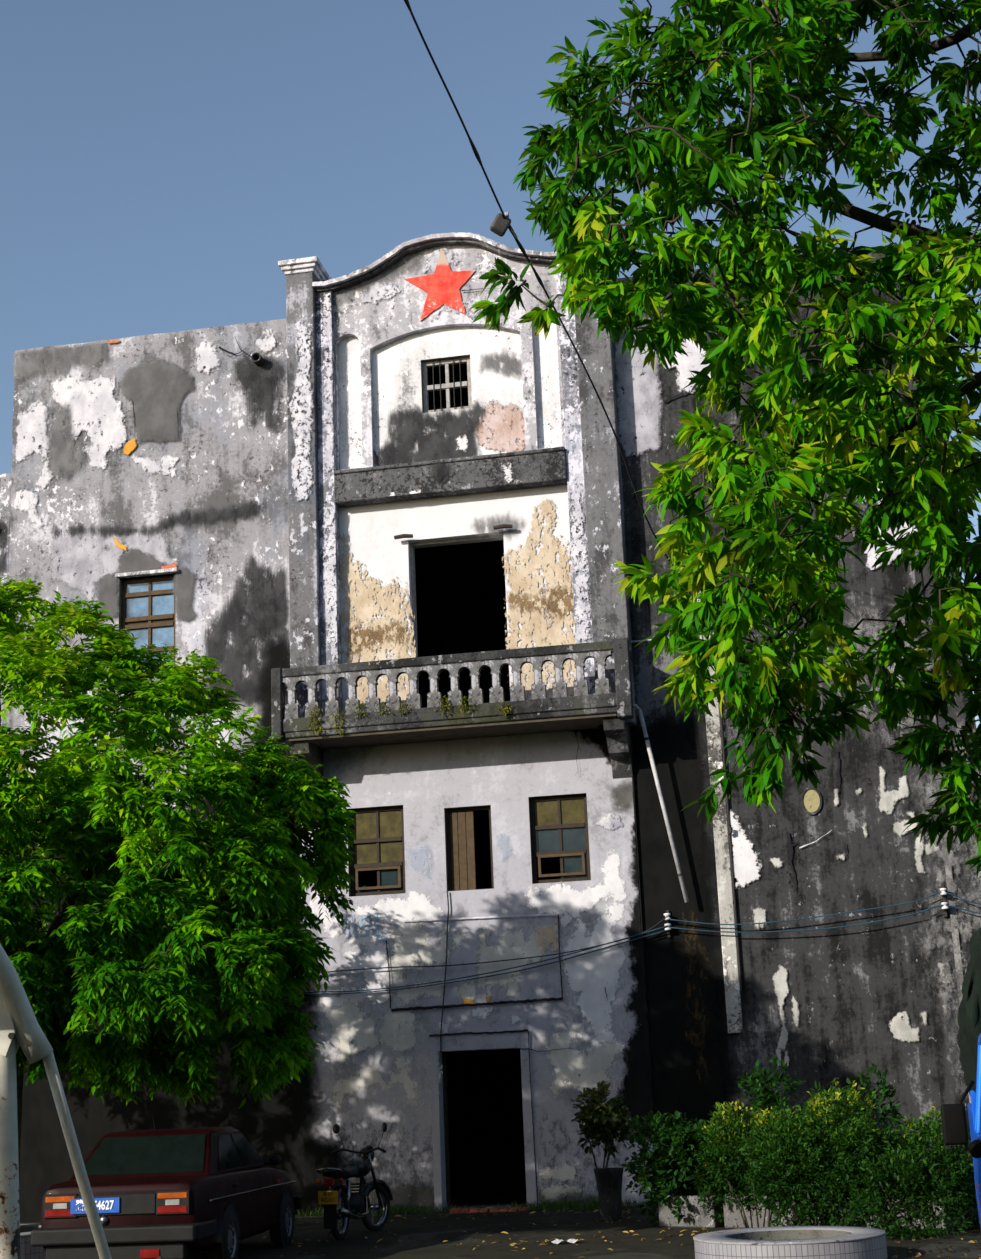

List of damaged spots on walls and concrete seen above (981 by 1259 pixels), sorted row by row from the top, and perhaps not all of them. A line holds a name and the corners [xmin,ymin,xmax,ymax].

peeling [12,374,179,528]
water stain [233,355,284,432]
peeling [290,293,334,501]
water stain [375,401,485,483]
water stain [204,556,295,764]
peeling [321,505,416,663]
peeling [502,491,592,650]
peeling [727,810,782,888]
water stain [915,772,979,814]
peeling [309,849,629,1111]
water stain [925,822,981,1042]
water stain [19,934,435,1223]